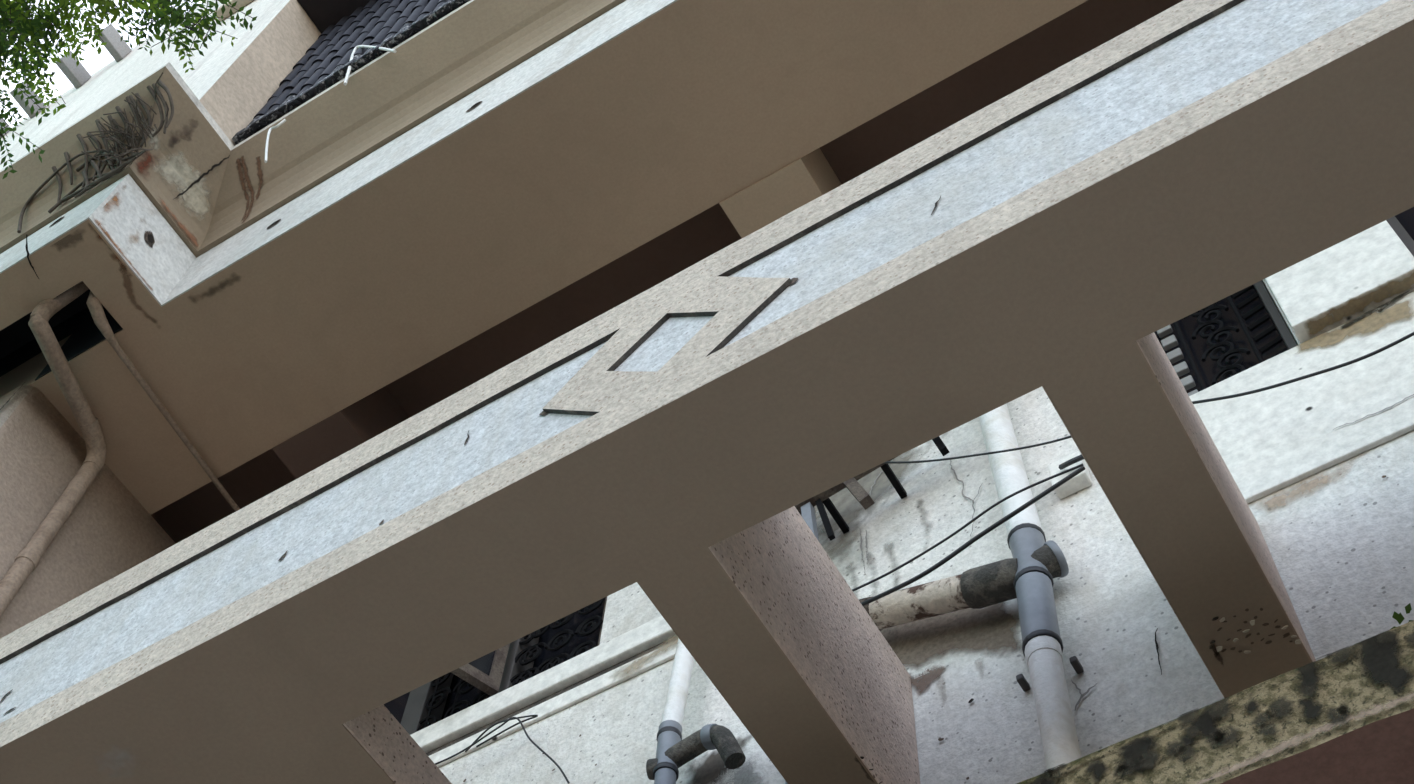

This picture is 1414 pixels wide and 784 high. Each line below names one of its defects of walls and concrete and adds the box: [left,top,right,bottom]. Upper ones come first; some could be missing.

crack [173,155,230,200]
corrosion [90,196,153,290]
water stain [1299,271,1414,351]
water stain [880,602,1018,694]
spalling [1210,608,1302,664]
water stain [1197,693,1414,784]